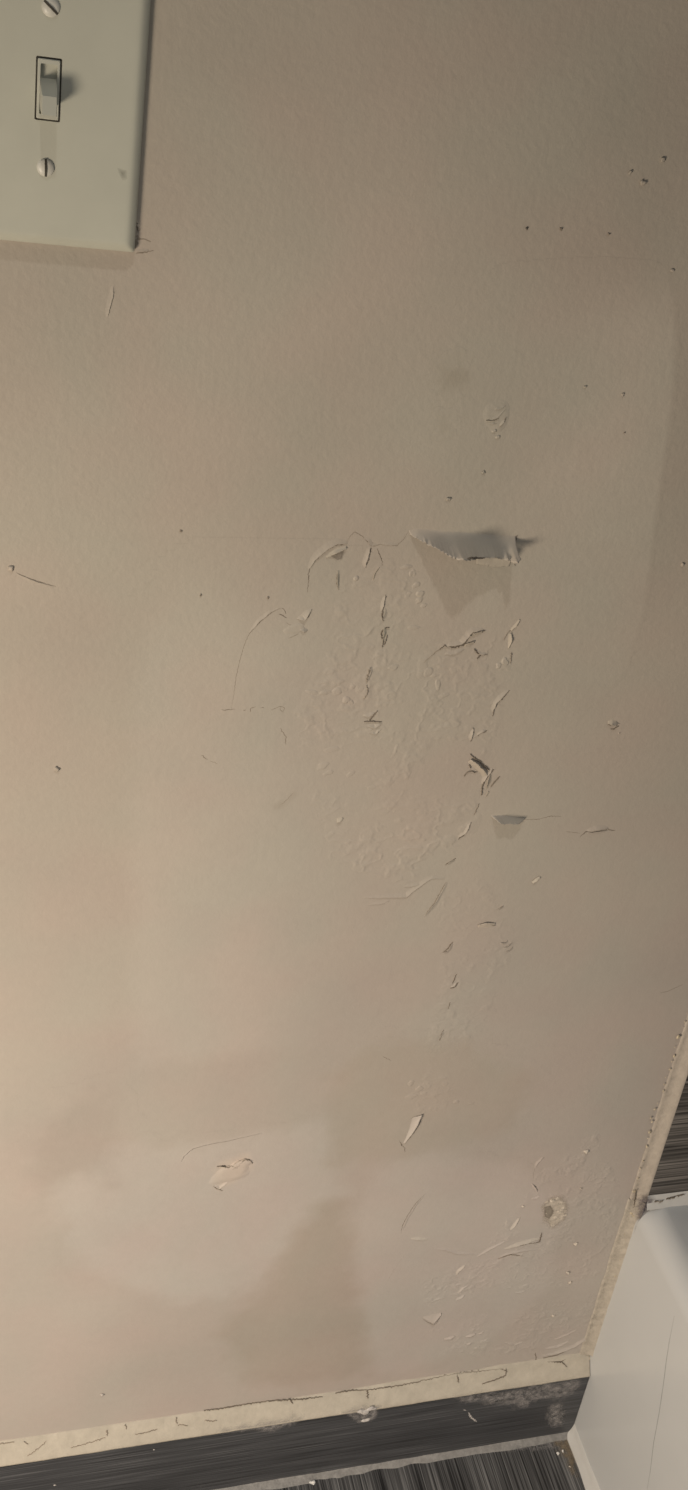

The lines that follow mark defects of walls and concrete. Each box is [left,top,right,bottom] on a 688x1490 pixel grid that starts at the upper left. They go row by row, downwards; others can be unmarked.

peeling [409,528,521,567]
peeling [464,755,499,797]
peeling [400,1115,424,1151]